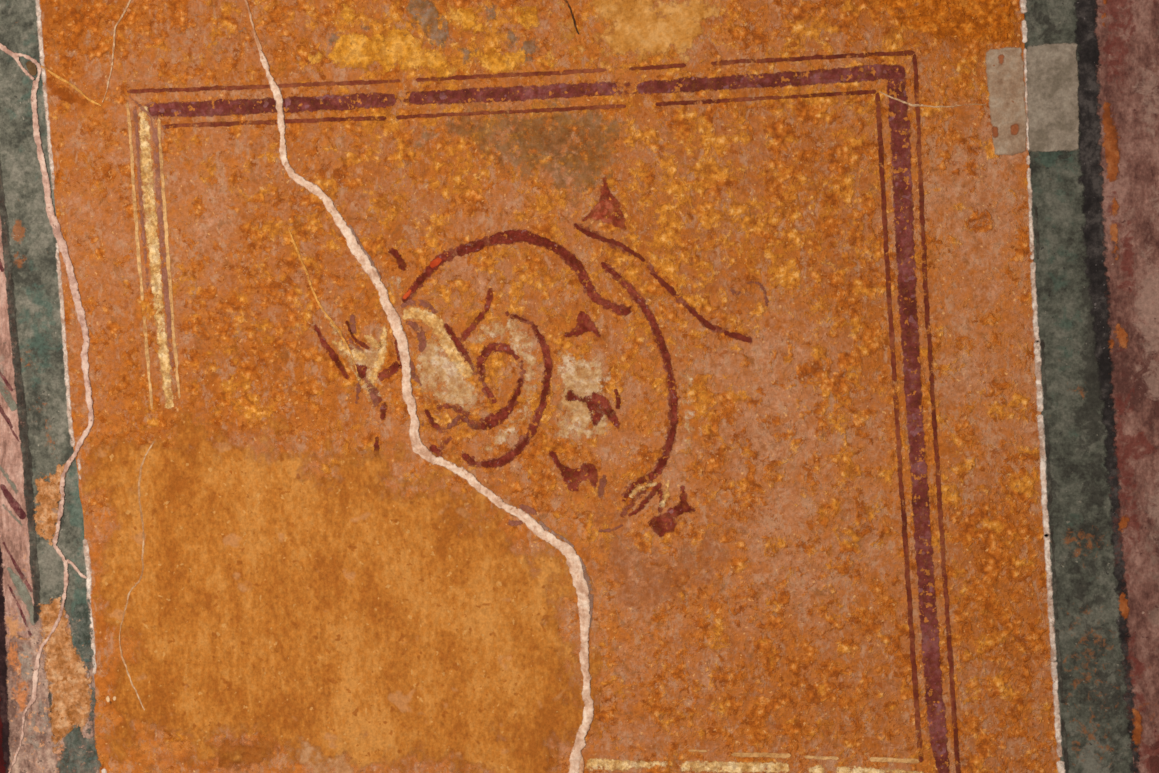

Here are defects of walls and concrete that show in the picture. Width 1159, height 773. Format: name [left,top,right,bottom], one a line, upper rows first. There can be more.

peeling [33,463,66,546]
peeling [6,597,116,773]
crack [0,0,131,773]
crack [119,441,155,710]
crack [245,0,594,773]